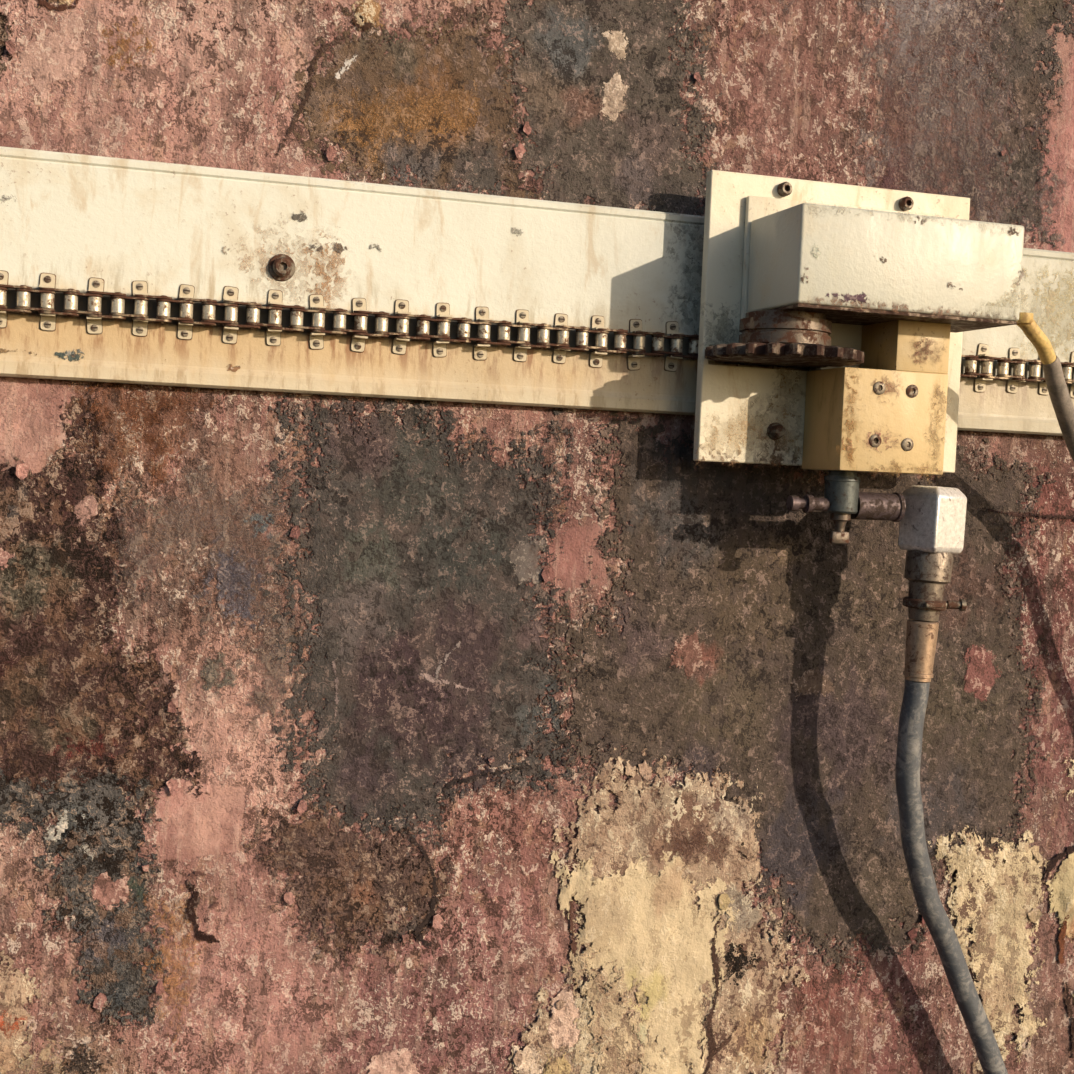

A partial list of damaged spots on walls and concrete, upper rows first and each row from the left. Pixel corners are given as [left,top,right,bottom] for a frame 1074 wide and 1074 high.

rust [323,79,482,160]
leakage [509,535,547,585]
peeling [244,393,933,986]
peeling [857,435,1058,893]
peeling [0,393,210,1074]
crack [184,871,220,944]
crack [569,901,577,956]
peeling [548,986,583,1049]
crack [703,913,740,1074]